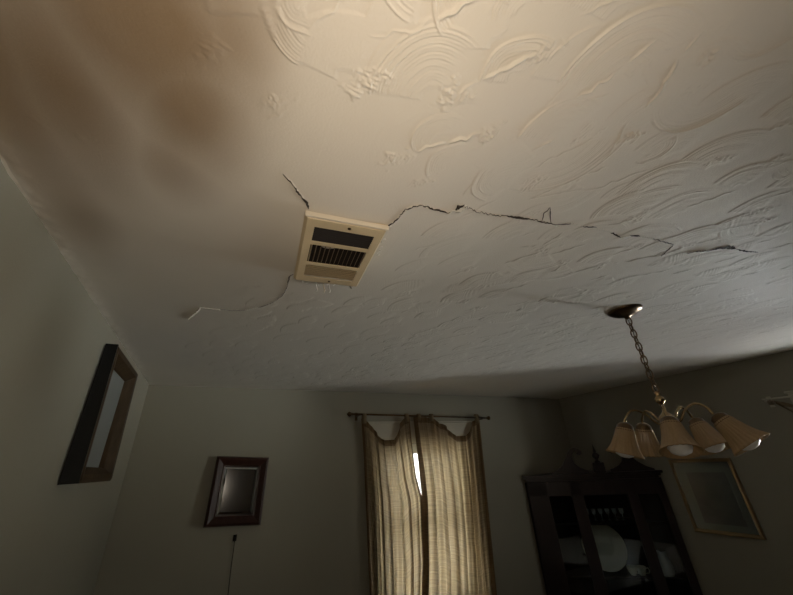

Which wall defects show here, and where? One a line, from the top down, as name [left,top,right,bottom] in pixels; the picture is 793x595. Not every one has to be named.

water stain [75,0,201,73]
crack [388,204,754,256]